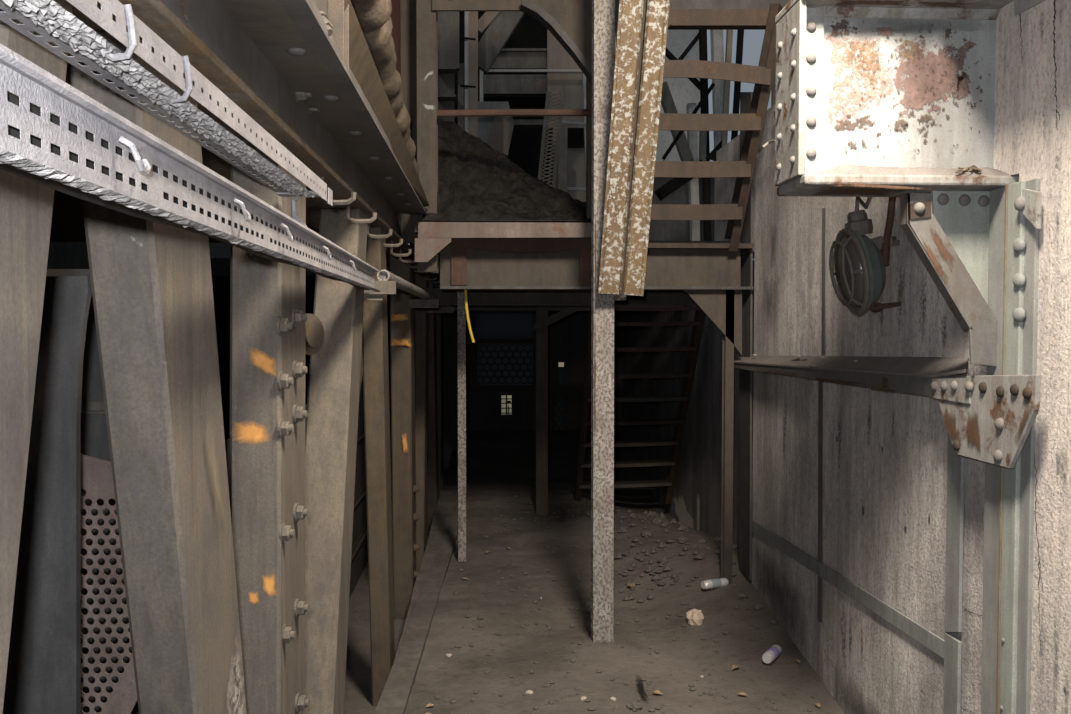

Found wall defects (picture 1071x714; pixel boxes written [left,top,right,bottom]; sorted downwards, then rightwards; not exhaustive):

corrosion [830,19,858,37]
corrosion [834,113,873,149]
corrosion [893,114,950,132]
corrosion [944,409,980,450]